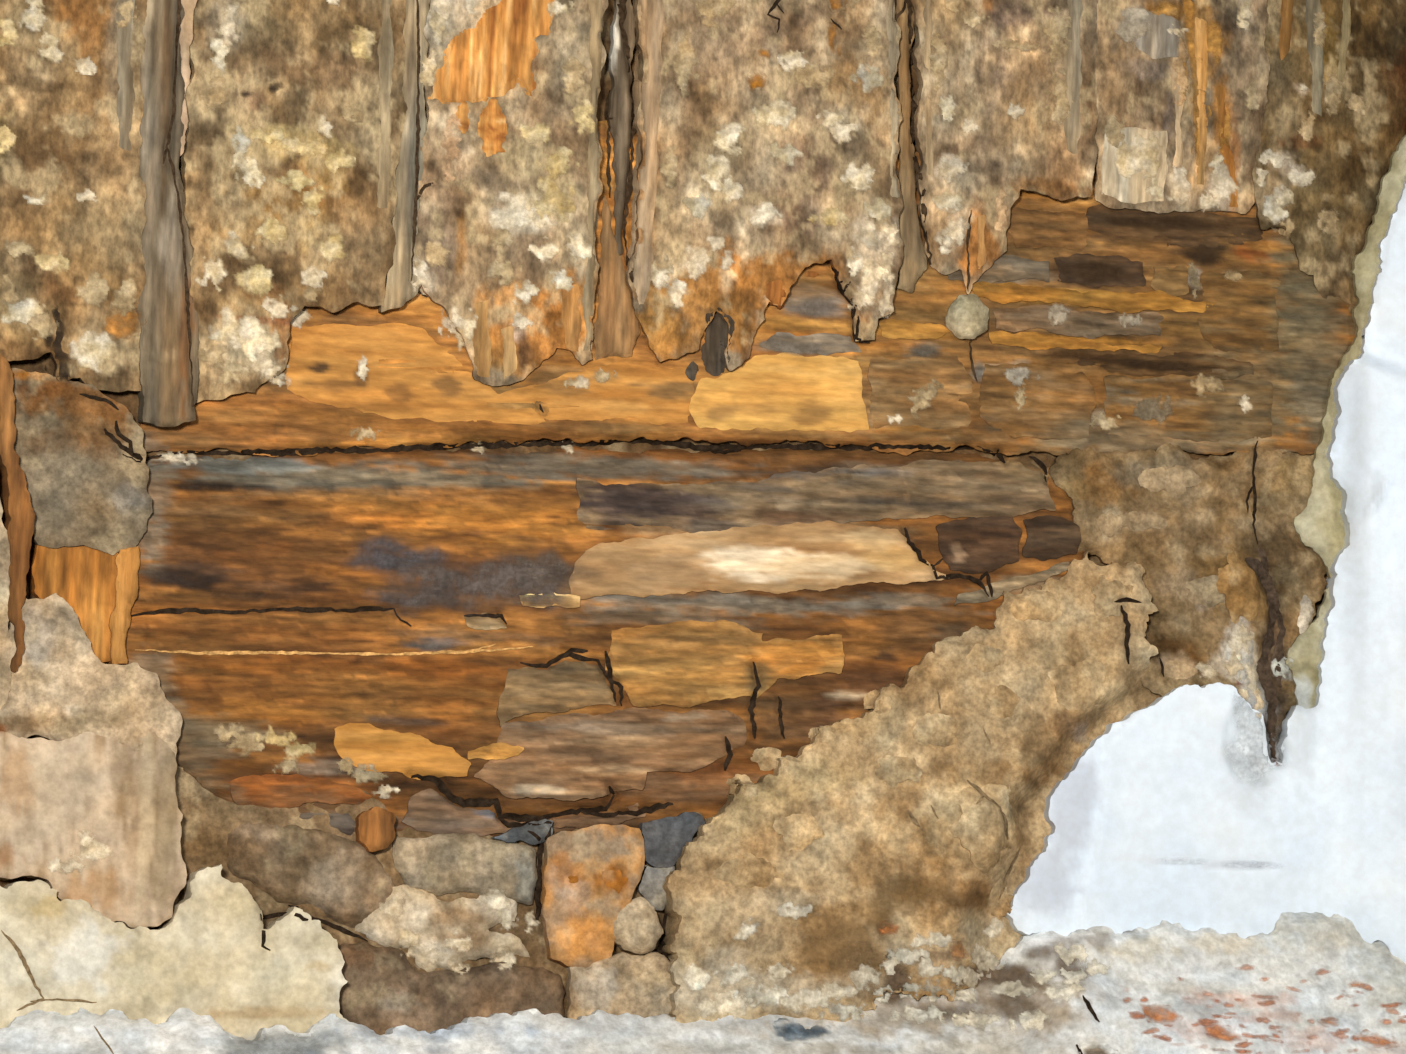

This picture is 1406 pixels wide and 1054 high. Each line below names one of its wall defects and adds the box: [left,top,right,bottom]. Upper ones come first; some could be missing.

peeling [231,107,363,215]
peeling [660,99,803,219]
peeling [809,163,900,317]
water stain [1126,216,1210,229]
peeling [1255,149,1315,237]
peeling [195,217,345,386]
spalling [685,307,735,381]
water stain [772,342,821,354]
water stain [1081,355,1212,371]
crack [79,393,1047,482]
crack [724,662,785,771]
water stain [1228,705,1274,775]